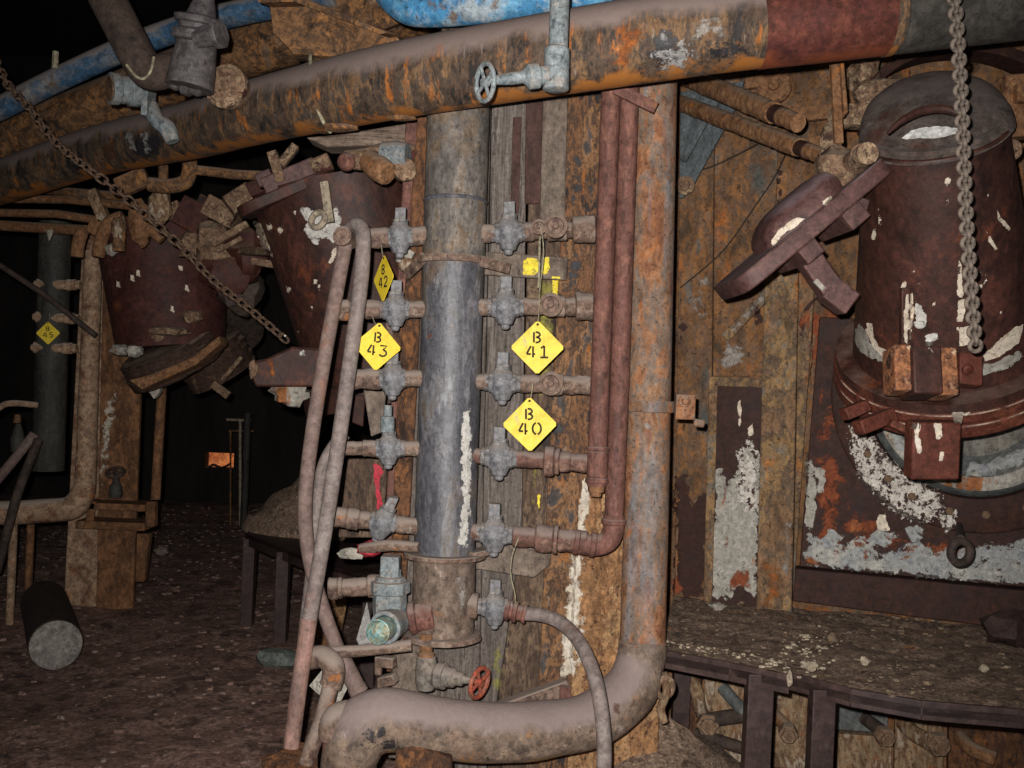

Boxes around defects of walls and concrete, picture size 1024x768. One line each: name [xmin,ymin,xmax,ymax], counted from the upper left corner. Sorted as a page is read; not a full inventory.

leakage [577,478,591,531]
peeling [666,394,1024,708]
leakage [564,555,586,633]
leakage [560,634,581,677]